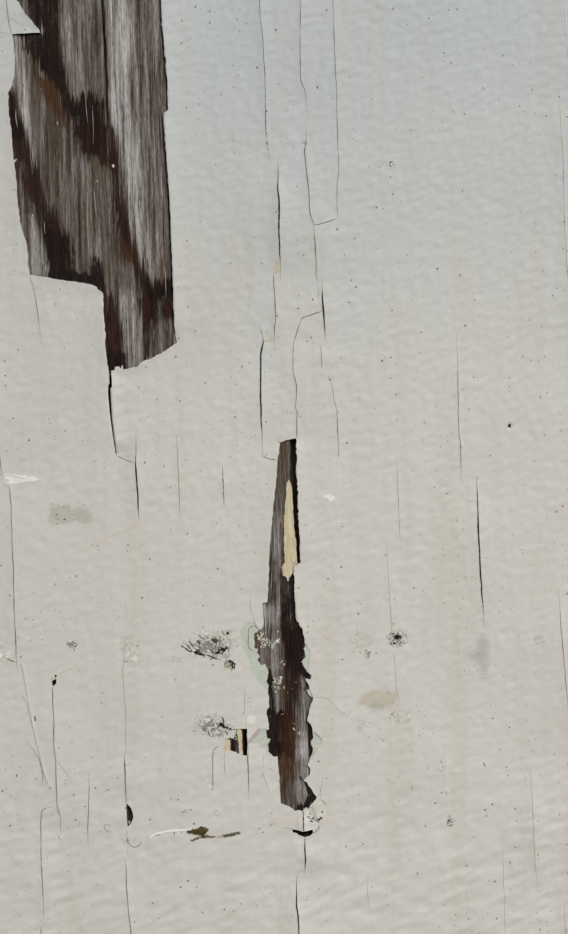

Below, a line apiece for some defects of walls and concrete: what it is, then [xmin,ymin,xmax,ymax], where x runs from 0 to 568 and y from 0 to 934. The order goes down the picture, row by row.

peeling [8,0,177,462]
crack [259,0,341,490]
peeling [172,438,328,834]
crack [457,380,484,619]
crack [296,776,326,932]